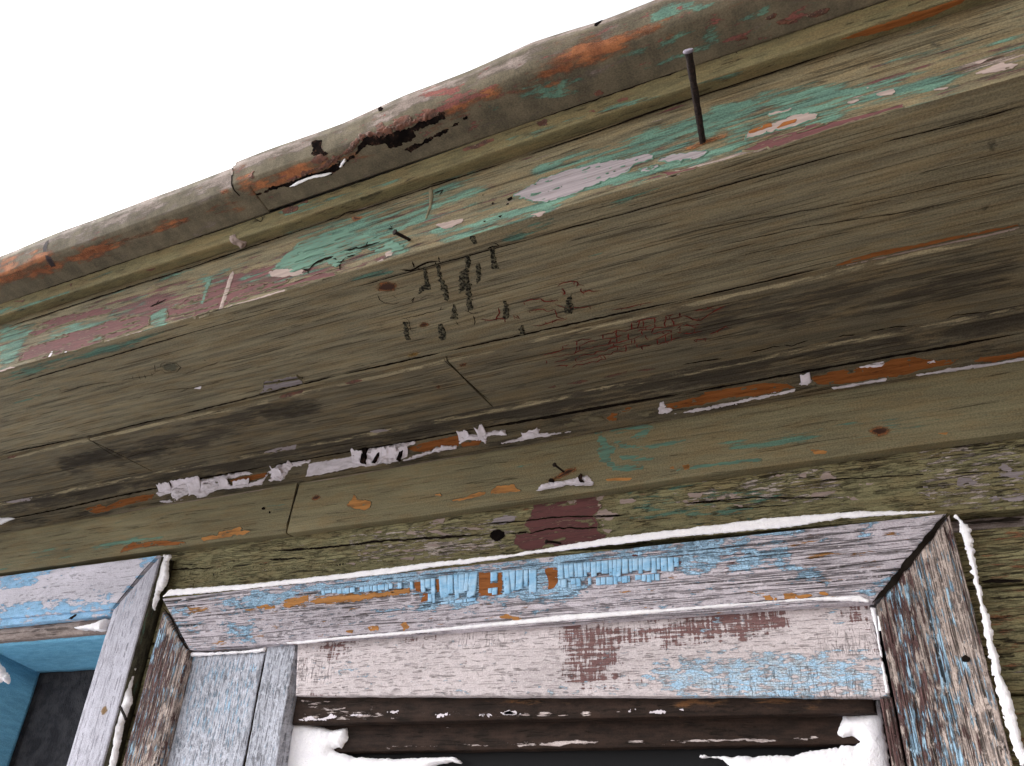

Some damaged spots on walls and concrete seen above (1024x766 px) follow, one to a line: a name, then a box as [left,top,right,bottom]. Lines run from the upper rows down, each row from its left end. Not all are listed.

peeling [841,0,964,40]
peeling [975,59,1018,74]
peeling [404,116,468,153]
peeling [742,87,905,152]
peeling [513,150,709,217]
peeling [166,231,406,319]
hole [418,236,499,340]
crack [0,52,1024,455]
crack [10,333,1020,518]
peeling [84,350,1024,514]
peeling [346,476,636,565]
peeling [257,554,679,610]